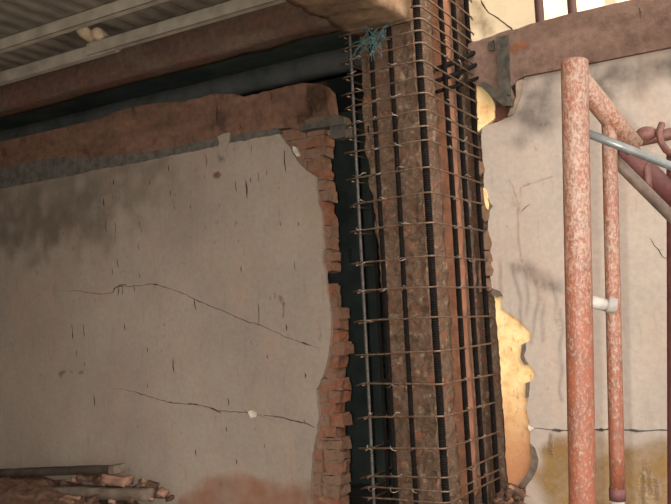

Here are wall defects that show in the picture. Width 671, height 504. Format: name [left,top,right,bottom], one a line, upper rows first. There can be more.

crack [481,0,513,30]
flaking render [476,85,511,133]
spalling [480,186,493,222]
crack [73,284,318,348]
flaking render [479,230,539,489]
crack [122,389,315,428]
crack [624,426,667,434]
leakage [539,441,569,504]
leakage [624,450,667,504]